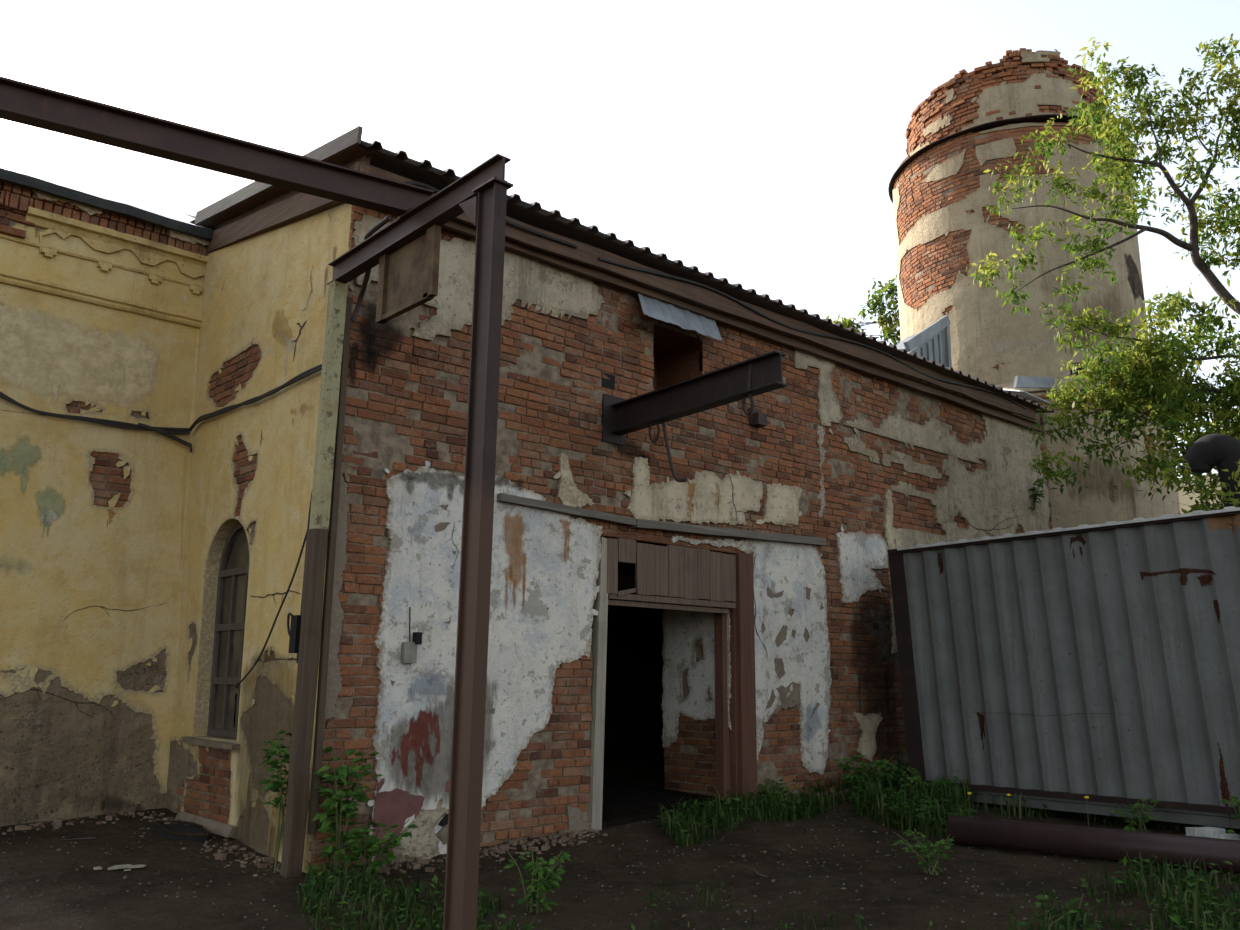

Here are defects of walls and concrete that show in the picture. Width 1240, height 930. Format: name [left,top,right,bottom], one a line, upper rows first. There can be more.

flaking render [893,49,1102,310]
flaking render [209,344,262,407]
crack [291,267,313,361]
leakage [351,302,403,383]
leakage [0,438,64,535]
flaking render [89,451,131,507]
crack [66,603,165,618]
flaking render [367,461,465,863]
flaking render [481,453,603,809]
flaking render [624,349,1050,775]
rust [1140,568,1215,587]
peeling [0,646,297,859]